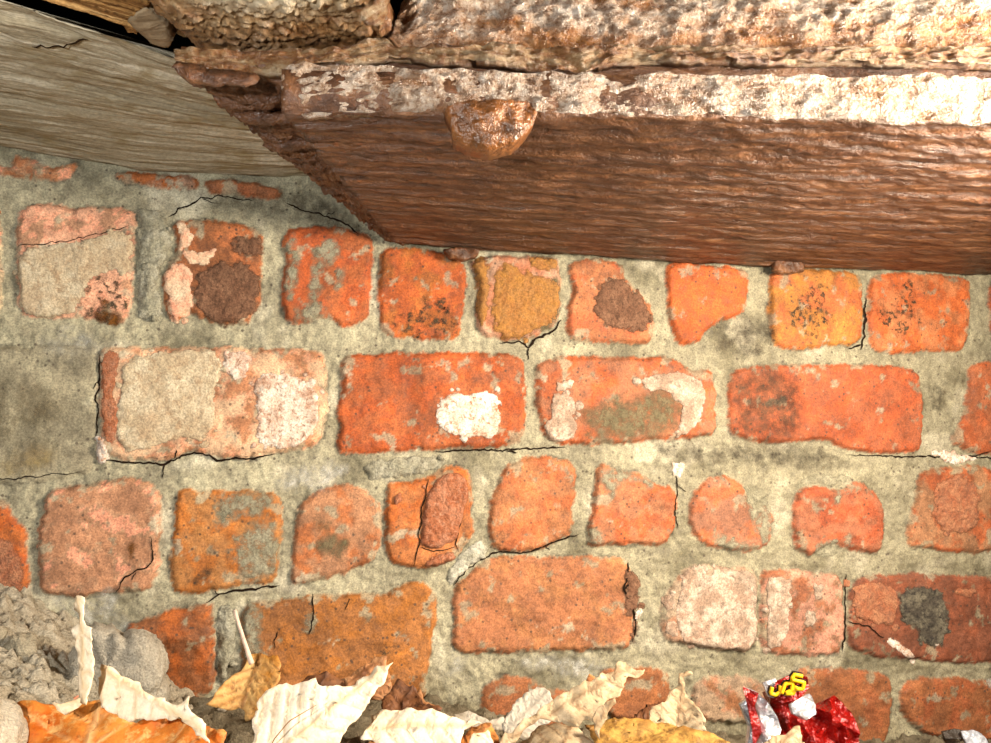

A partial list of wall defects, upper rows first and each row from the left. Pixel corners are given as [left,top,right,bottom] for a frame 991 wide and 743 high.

rust [355,0,390,26]
rust [171,61,260,87]
rust [443,247,480,262]
rust [771,260,805,275]
crack [92,355,100,435]
crack [0,472,77,480]
crack [106,450,273,477]
crack [414,480,579,584]
crack [116,536,154,592]